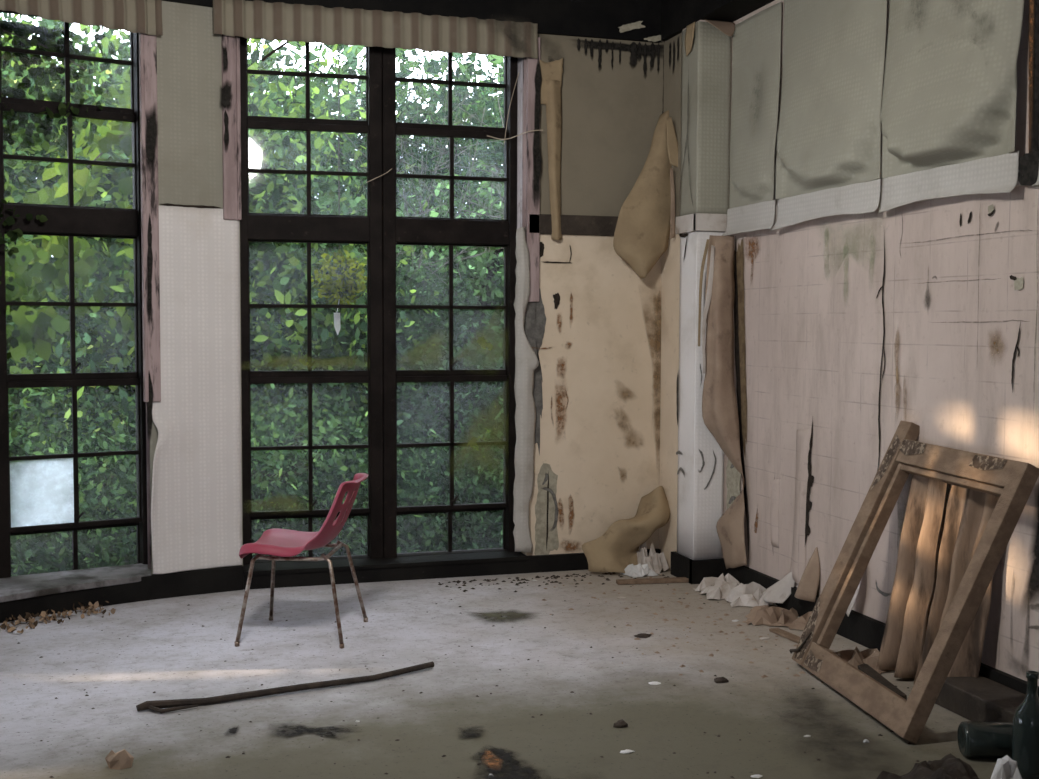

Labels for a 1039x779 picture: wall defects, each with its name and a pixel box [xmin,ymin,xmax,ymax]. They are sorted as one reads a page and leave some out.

leakage [577,37,679,77]
leakage [645,299,661,389]
crack [876,245,885,471]
crack [1011,322,1021,393]